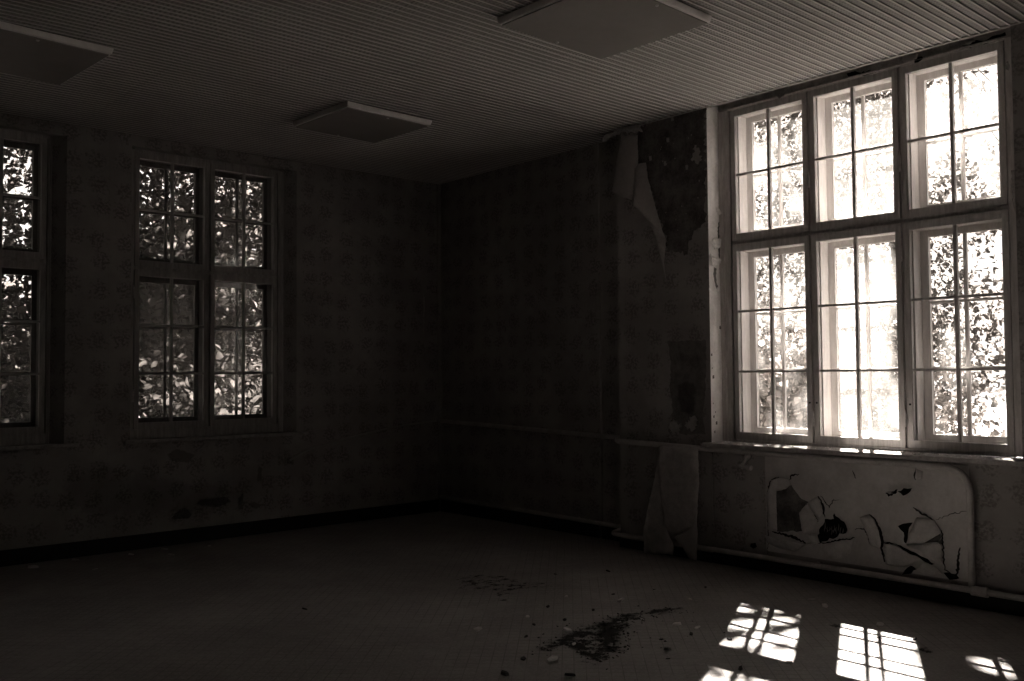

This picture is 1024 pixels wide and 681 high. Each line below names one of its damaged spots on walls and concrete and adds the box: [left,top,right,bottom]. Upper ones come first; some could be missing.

flaking render [637,108,721,292]
flaking render [767,474,855,561]
peeling [886,488,912,497]
peeling [882,507,942,575]